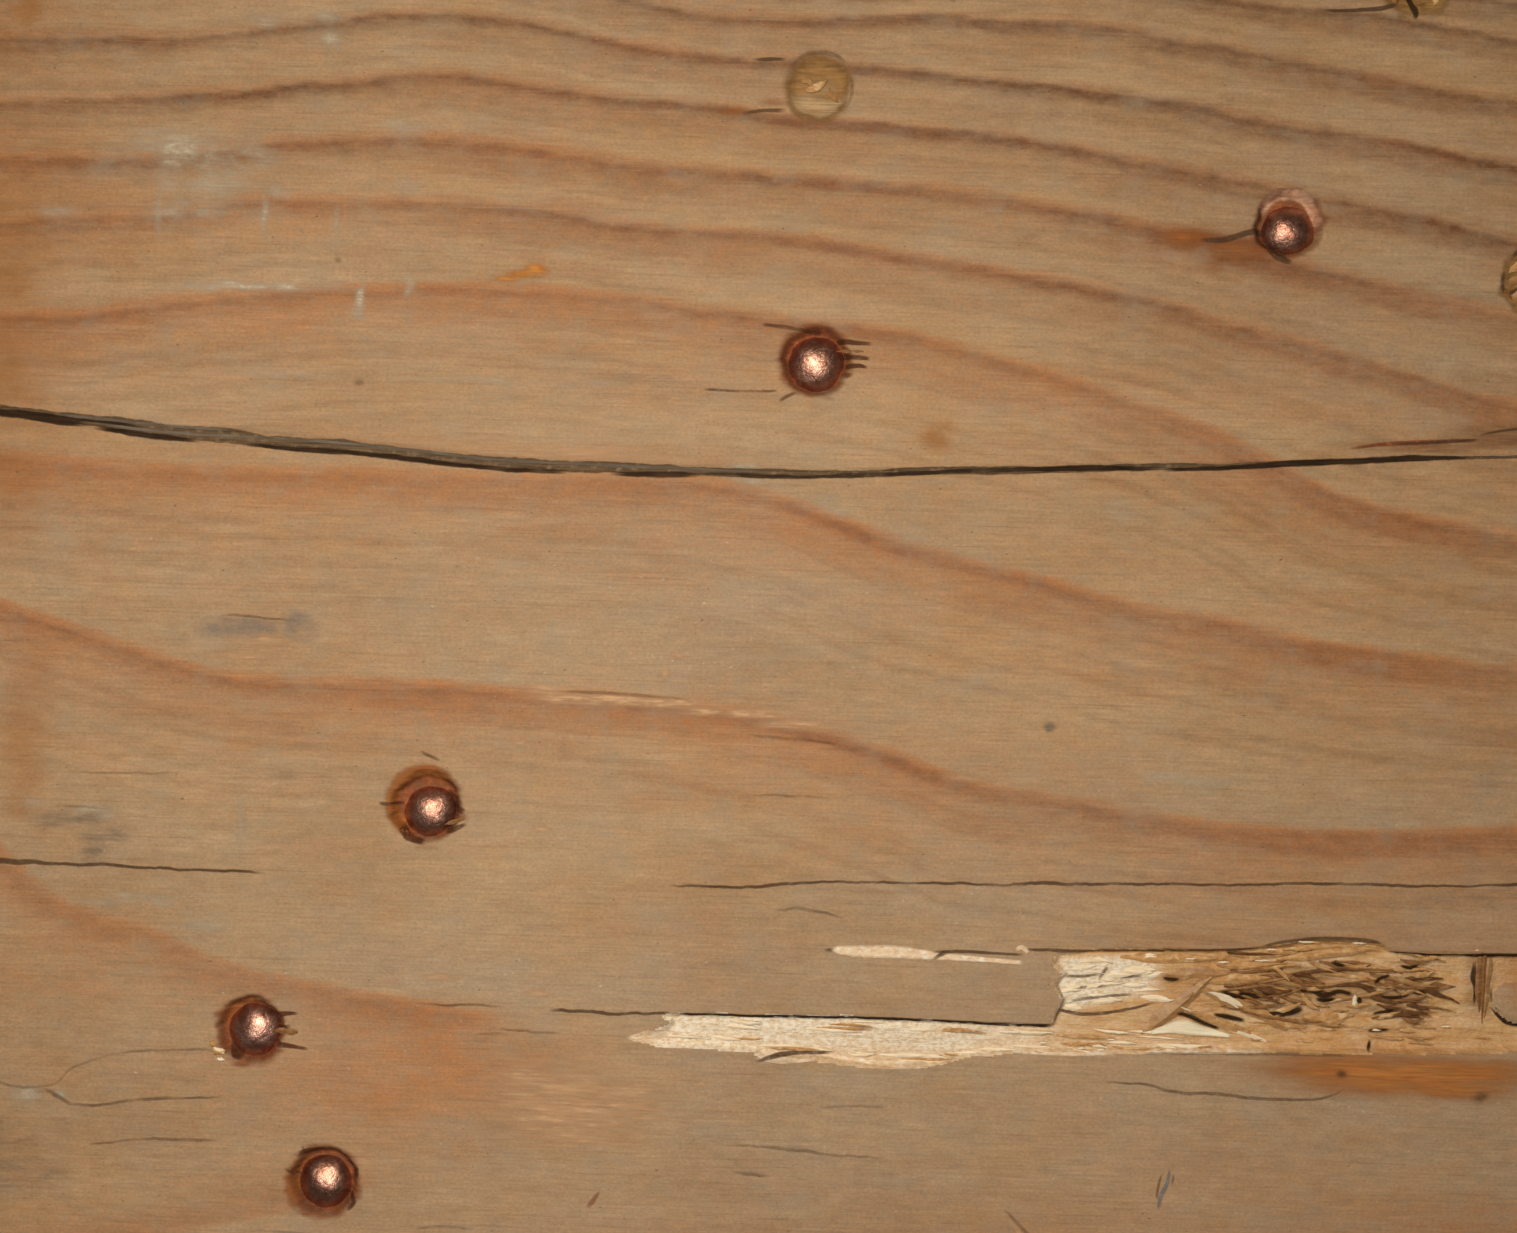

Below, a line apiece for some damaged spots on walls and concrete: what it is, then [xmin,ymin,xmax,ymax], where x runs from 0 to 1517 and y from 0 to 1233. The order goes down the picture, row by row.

crack [0,405,1517,479]
crack [0,858,255,873]
crack [682,880,1517,889]
spalling [629,937,1517,1069]